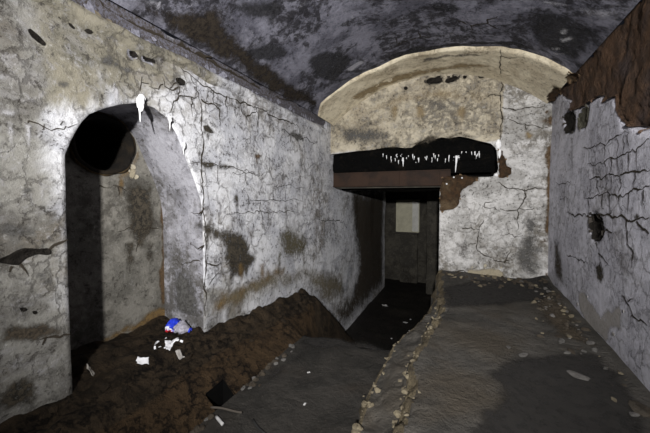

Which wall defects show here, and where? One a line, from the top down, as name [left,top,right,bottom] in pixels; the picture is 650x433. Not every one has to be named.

spalling [547,0,650,134]
crack [488,50,548,140]
crack [24,120,76,131]
leakage [196,224,254,279]
crack [140,68,320,316]
leakage [278,227,307,267]
spalling [439,174,478,213]
crack [462,131,650,268]
spalling [588,212,605,241]
crack [622,296,647,325]